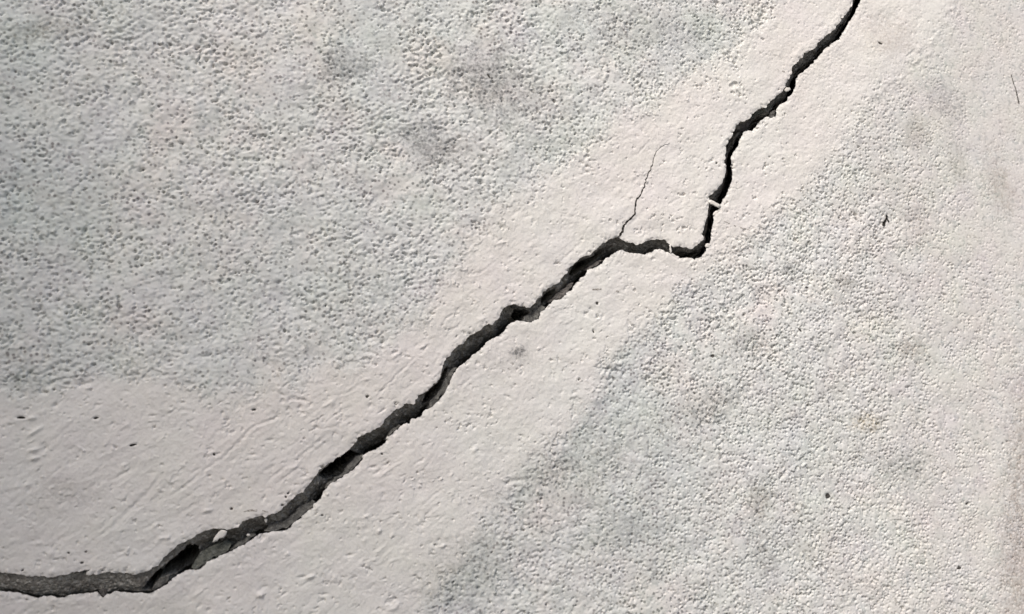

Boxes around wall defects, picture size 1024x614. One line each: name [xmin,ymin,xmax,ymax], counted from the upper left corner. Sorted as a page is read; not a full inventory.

crack [440,0,855,378]
crack [0,367,457,598]